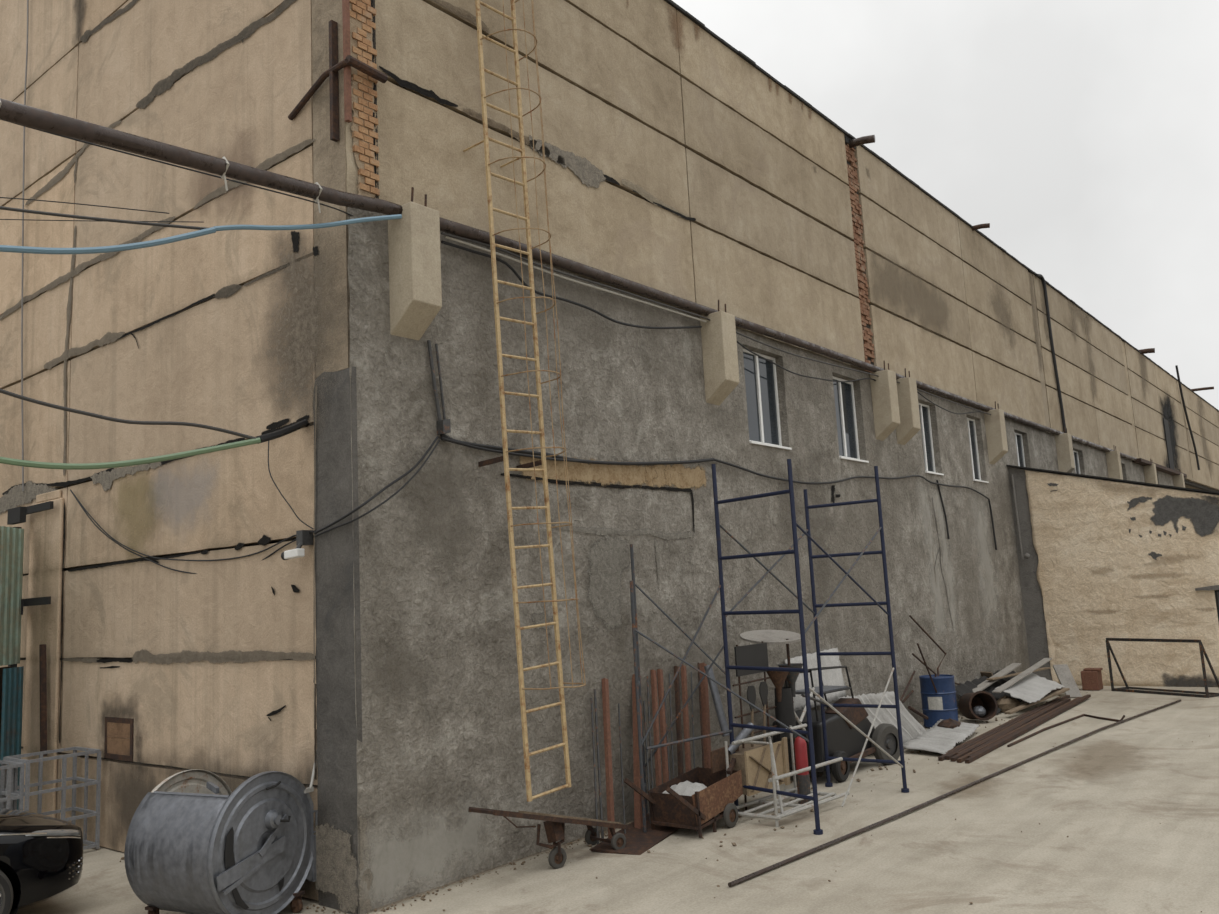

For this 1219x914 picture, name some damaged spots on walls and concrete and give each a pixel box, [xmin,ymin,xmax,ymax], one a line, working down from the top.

water stain [75,0,91,42]
spalling [529,135,606,188]
spalling [0,481,56,513]
peeling [1127,495,1219,537]